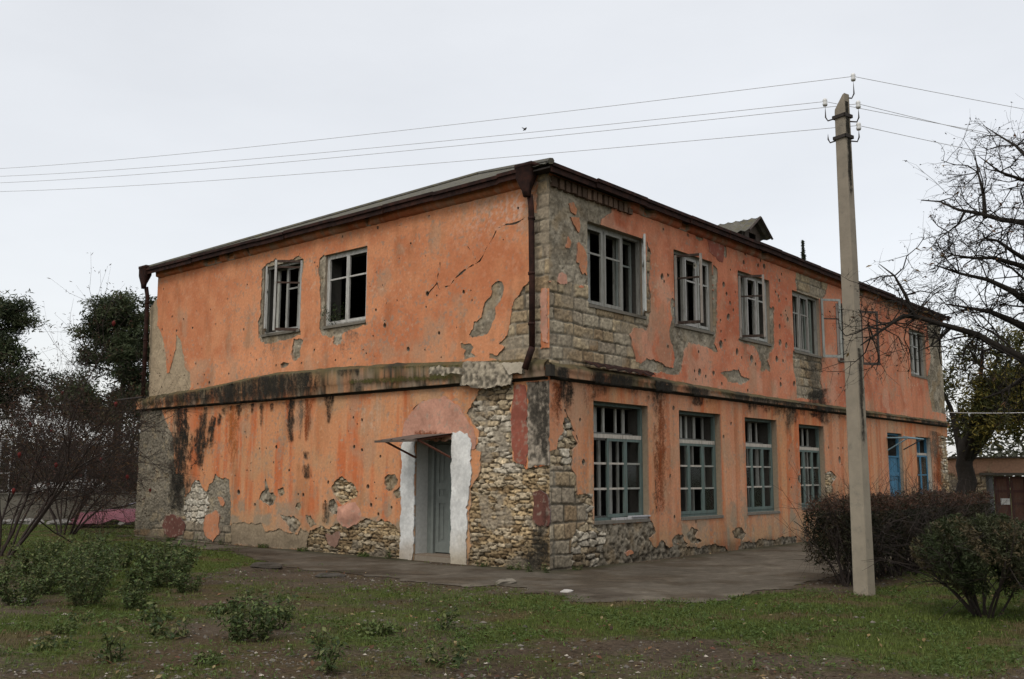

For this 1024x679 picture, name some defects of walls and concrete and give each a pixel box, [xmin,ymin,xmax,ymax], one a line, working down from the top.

flaking render [795,273,828,299]
peeling [148,299,191,396]
damp [350,373,450,391]
flaking render [428,173,796,571]
flaking render [793,353,822,400]
damp [168,403,273,510]
flaking render [134,474,401,558]